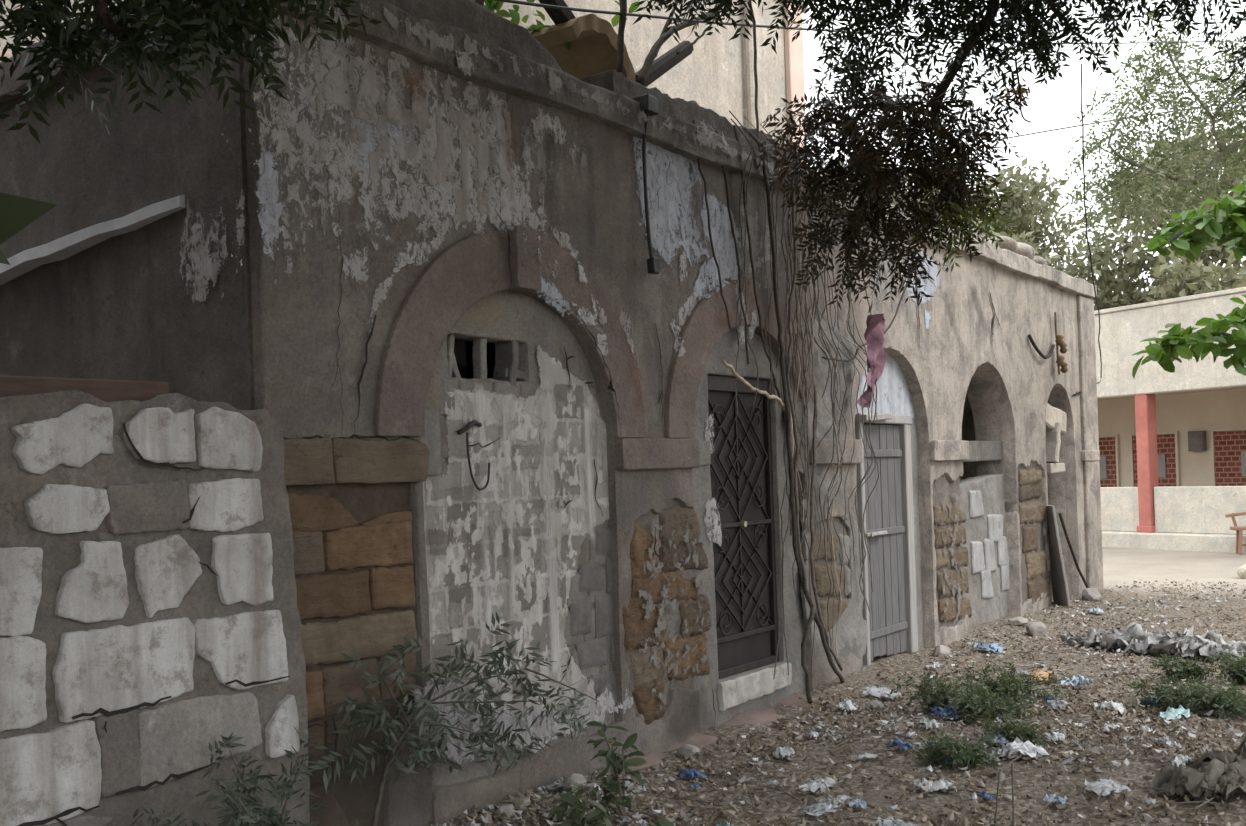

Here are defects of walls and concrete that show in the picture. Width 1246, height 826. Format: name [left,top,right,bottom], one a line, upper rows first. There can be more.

peeling [177,151,285,311]
crack [283,205,420,443]
peeling [279,0,635,360]
peeling [633,136,758,357]
peeling [903,252,940,329]
peeling [284,344,722,826]